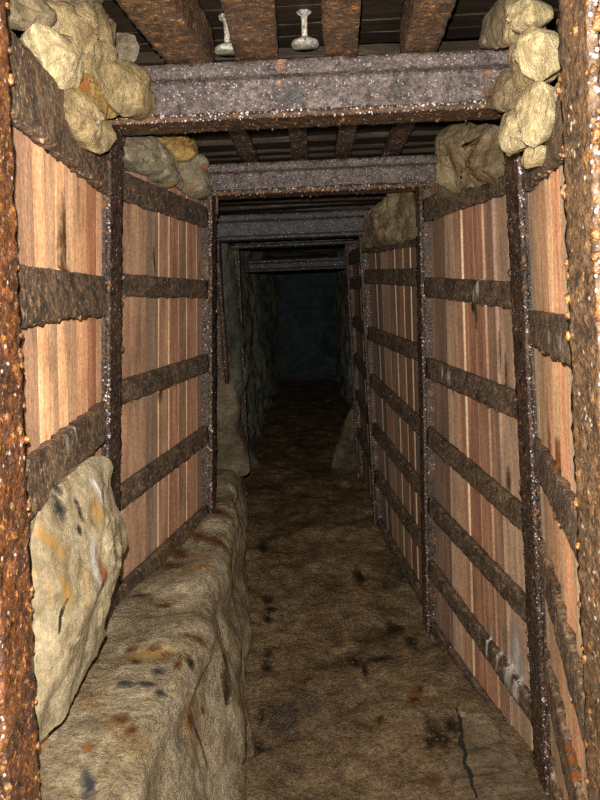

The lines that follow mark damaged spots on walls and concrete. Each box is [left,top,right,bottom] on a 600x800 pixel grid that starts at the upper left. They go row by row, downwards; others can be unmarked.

water stain [486,625,525,704]
crack [446,707,478,798]